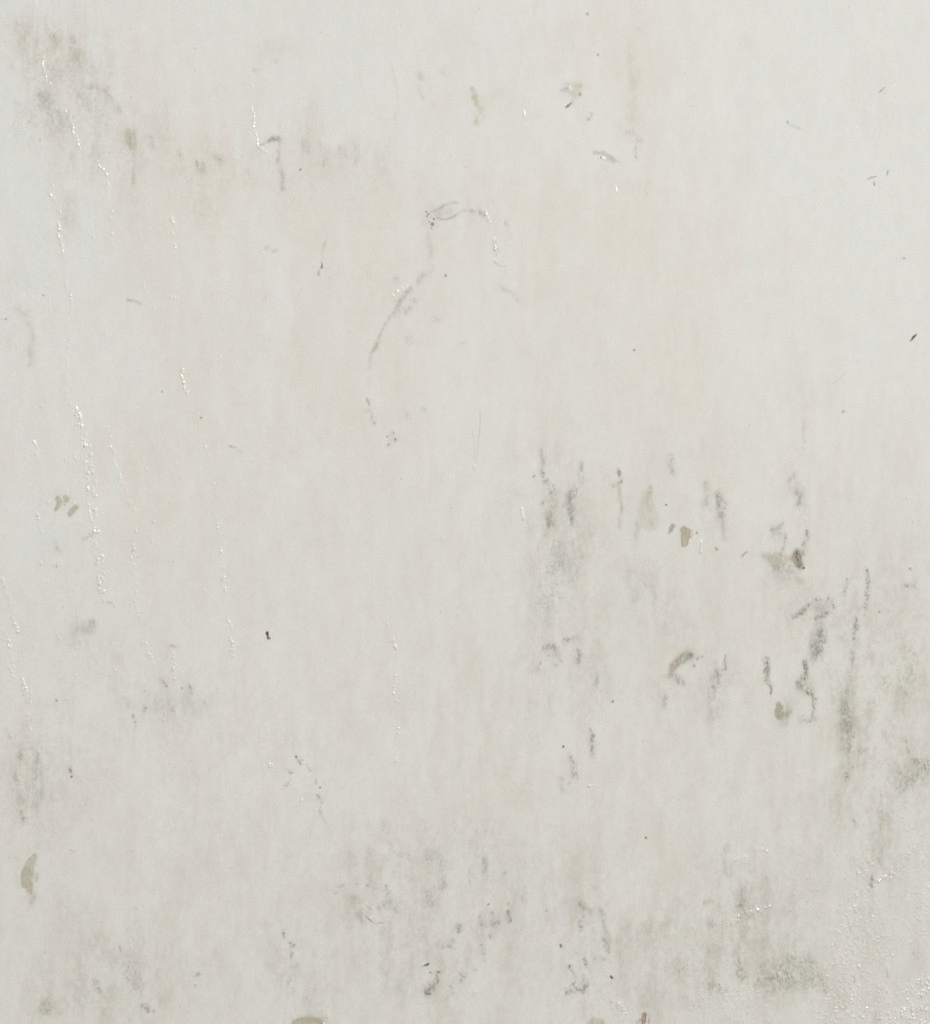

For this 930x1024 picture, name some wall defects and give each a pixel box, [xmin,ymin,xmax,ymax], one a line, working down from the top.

damp [609,466,695,549]
damp [698,477,731,545]
damp [526,446,610,698]
damp [658,644,730,730]
damp [757,516,930,893]
damp [554,726,598,795]